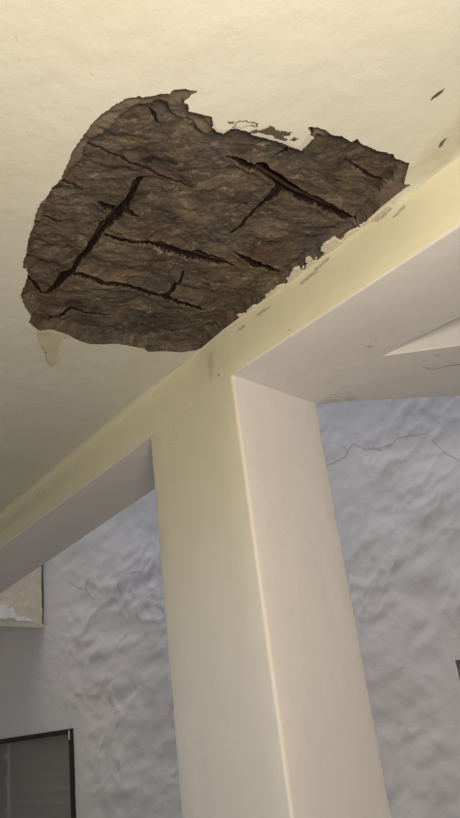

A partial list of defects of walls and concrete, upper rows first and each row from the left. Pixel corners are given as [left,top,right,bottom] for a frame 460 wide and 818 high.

spalling [20,89,424,366]
crack [326,432,460,465]